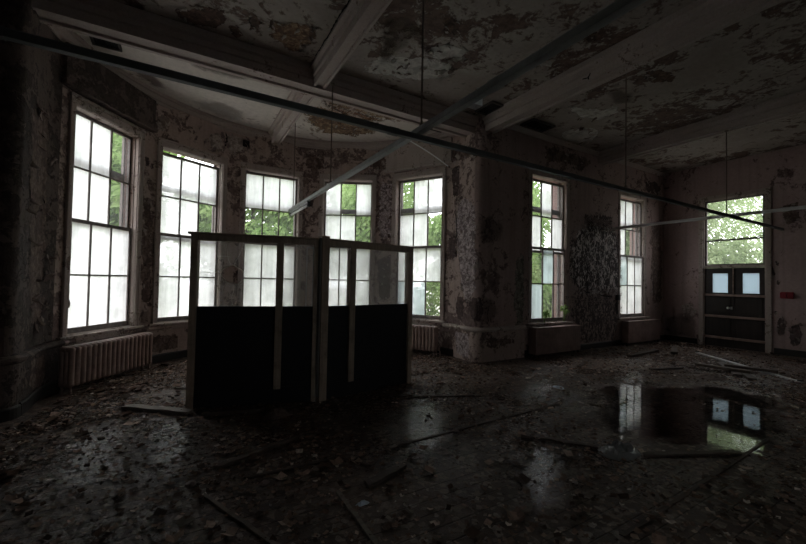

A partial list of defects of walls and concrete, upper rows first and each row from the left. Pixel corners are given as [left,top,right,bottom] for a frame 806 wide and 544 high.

peeling [175,4,317,55]
peeling [361,17,468,82]